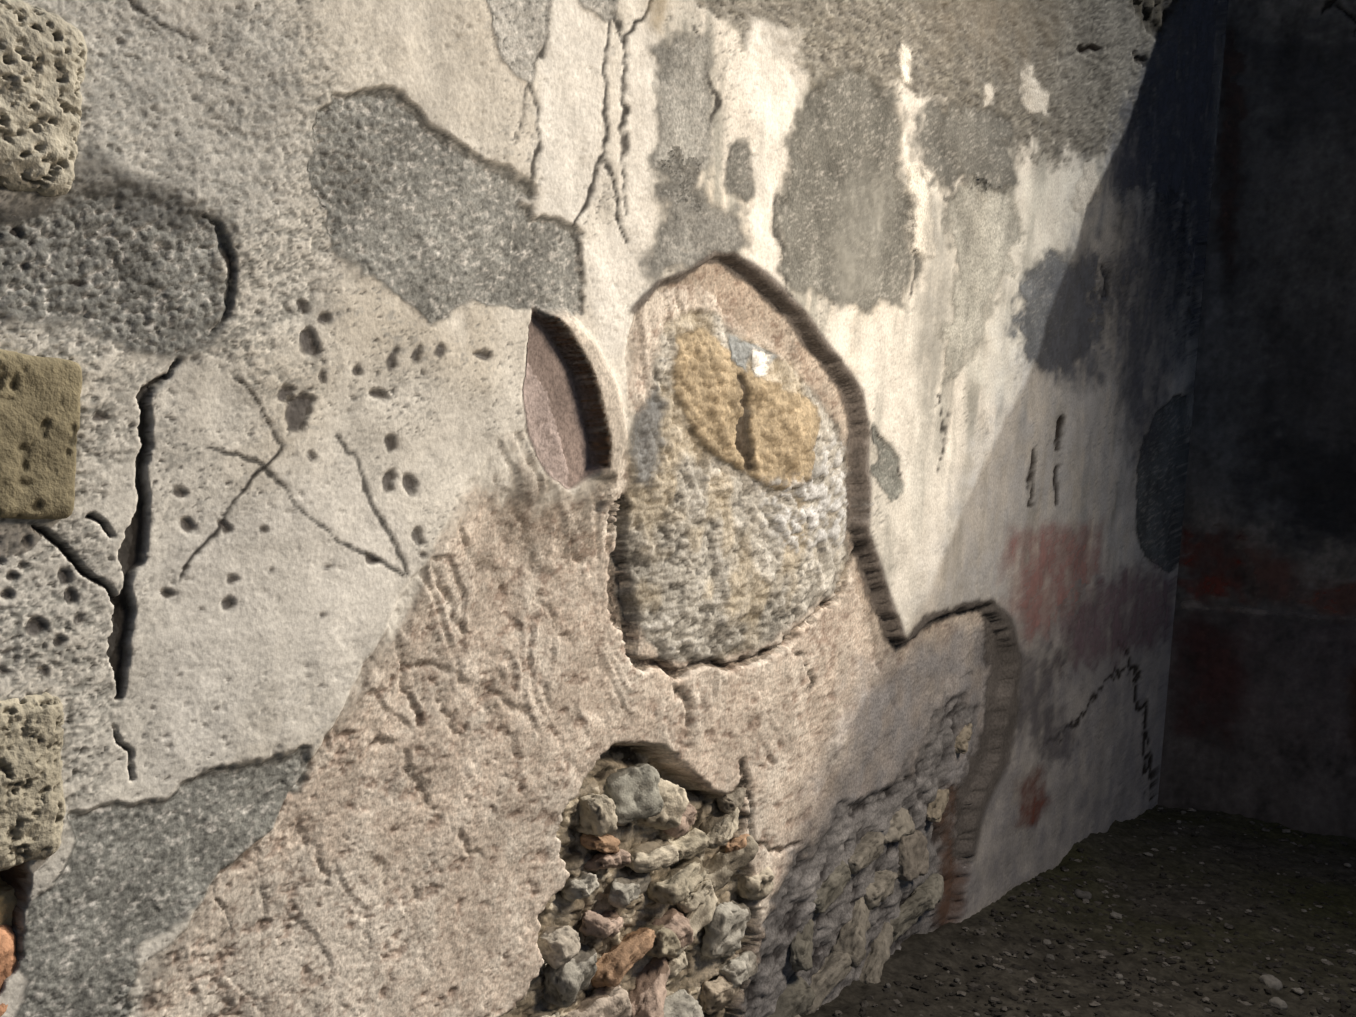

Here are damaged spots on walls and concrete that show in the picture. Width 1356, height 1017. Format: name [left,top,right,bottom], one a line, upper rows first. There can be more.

crack [517,38,547,199]
crack [573,0,653,315]
water stain [836,186,885,301]
crack [31,359,176,698]
crack [180,377,408,579]
peeling [0,34,1101,1017]
peeling [1136,394,1192,573]
crack [113,734,130,773]
crack [1049,645,1155,801]